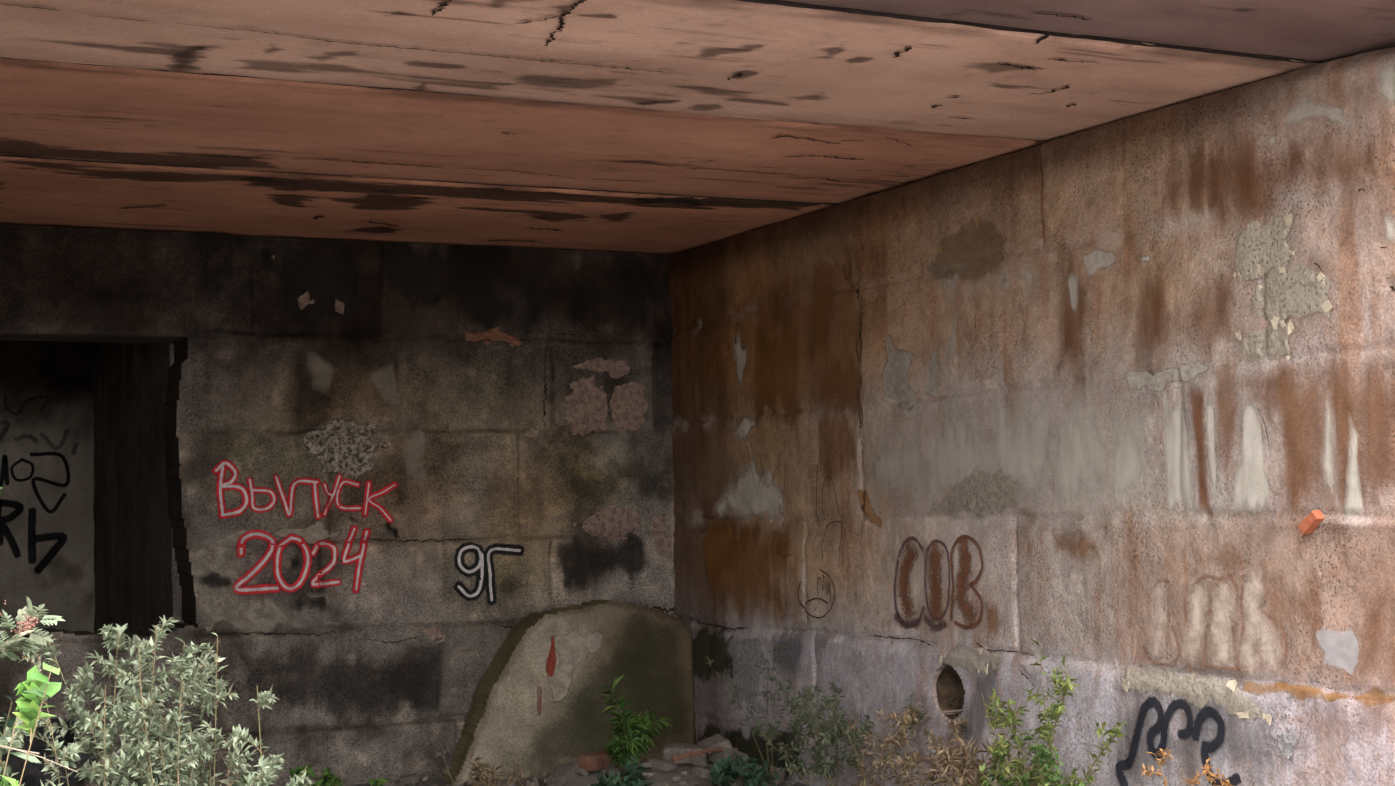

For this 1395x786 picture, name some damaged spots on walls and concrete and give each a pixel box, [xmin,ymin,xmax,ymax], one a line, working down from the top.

crack [0,0,678,74]
spalling [564,358,649,436]